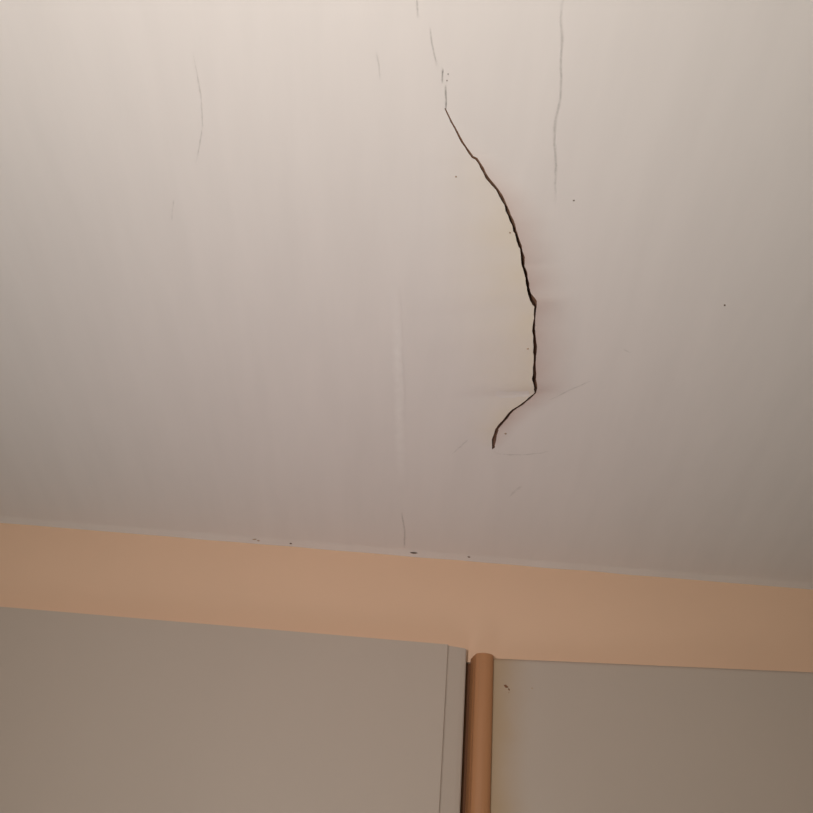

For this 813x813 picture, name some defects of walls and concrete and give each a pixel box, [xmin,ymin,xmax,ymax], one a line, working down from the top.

crack [444,108,537,449]